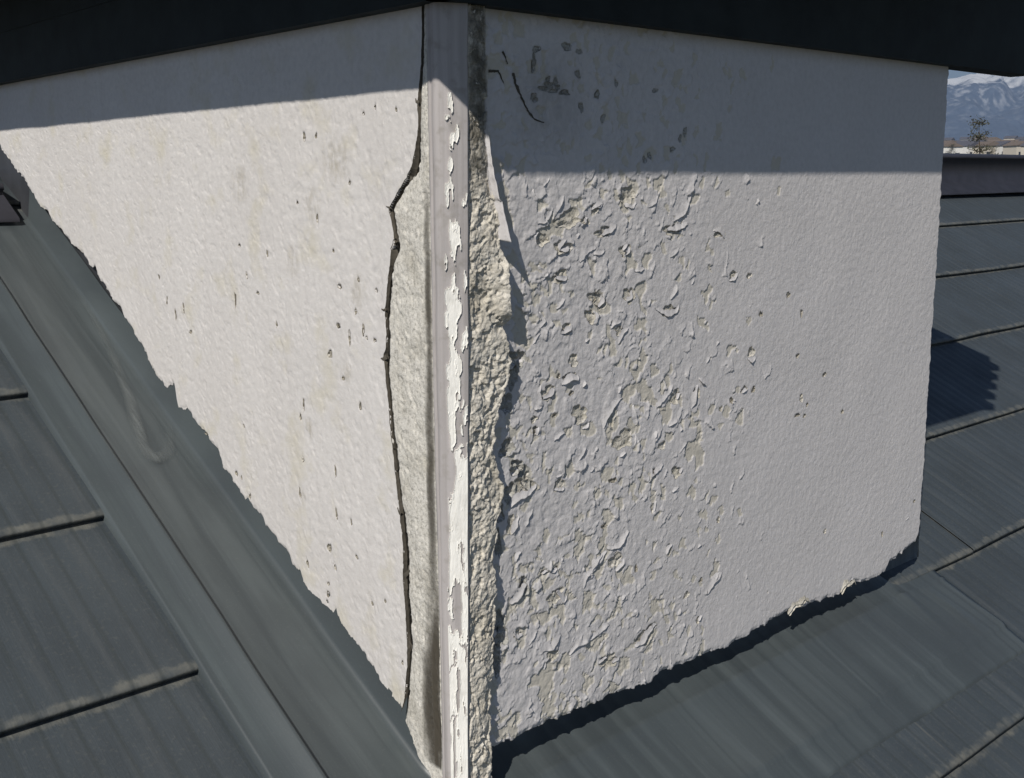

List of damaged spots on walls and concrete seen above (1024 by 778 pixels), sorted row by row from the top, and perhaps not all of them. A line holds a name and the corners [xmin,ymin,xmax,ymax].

crack [488,51,544,123]
peeling [620,187,658,209]
peeling [662,189,694,258]
peeling [622,288,636,305]
peeling [655,284,680,317]
crack [381,6,425,712]
spalling [444,4,620,778]
peeling [602,386,638,458]
peeling [656,378,706,409]
peeling [653,463,683,493]
peeling [583,530,638,589]
peeling [633,622,657,648]